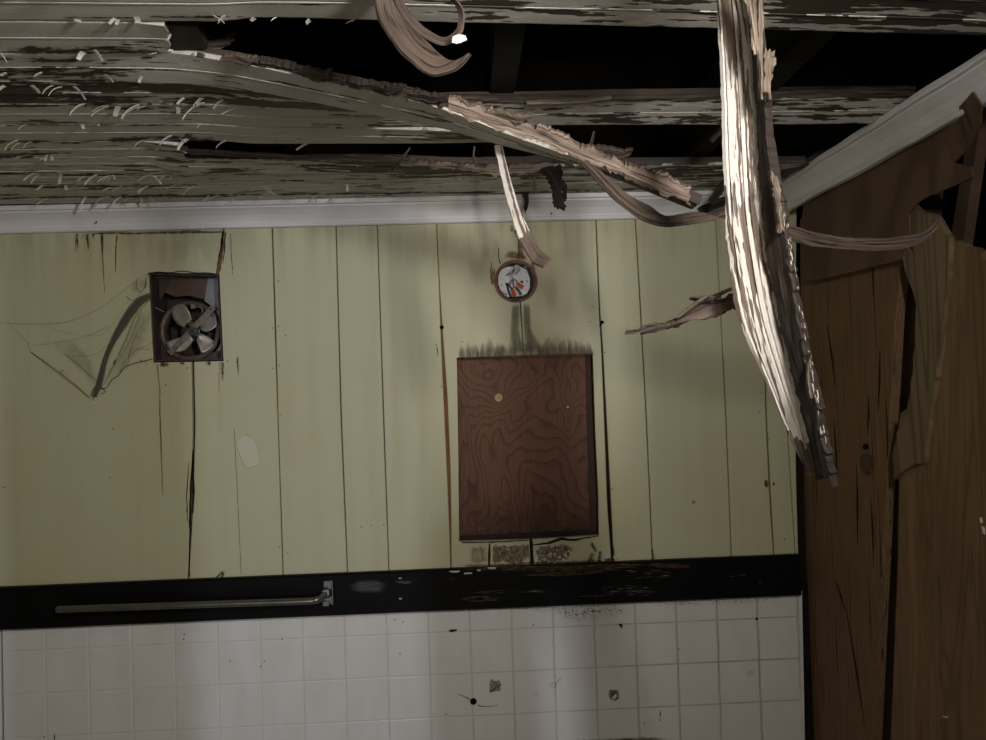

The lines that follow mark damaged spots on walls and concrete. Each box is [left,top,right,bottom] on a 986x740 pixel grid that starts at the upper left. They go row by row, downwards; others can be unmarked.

peeling [65,15,256,25]
peeling [452,34,467,44]
peeling [0,46,350,210]
spalling [746,5,839,487]
water stain [501,306,535,357]
crack [157,364,195,577]